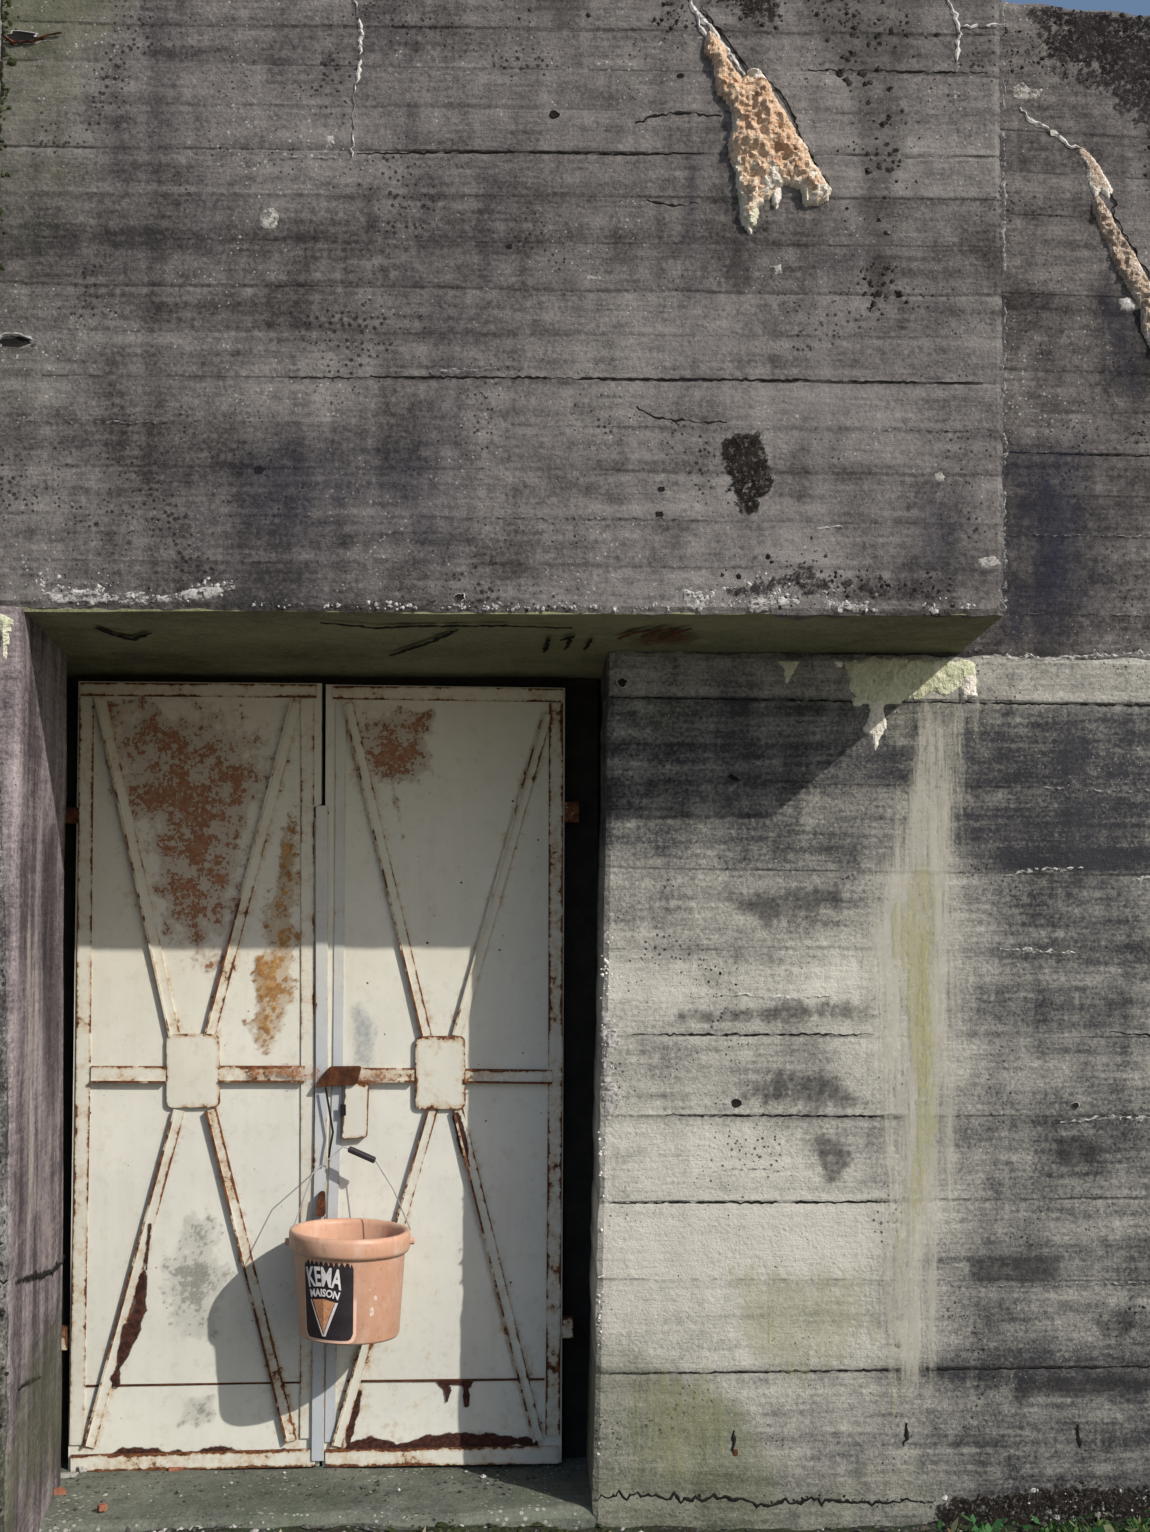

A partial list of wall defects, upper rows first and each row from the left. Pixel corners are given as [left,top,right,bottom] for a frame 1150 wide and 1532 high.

crack [350,0,722,157]
crack [689,0,746,76]
spalling [701,6,833,235]
crack [808,0,1004,74]
spalling [1078,147,1150,348]
corrosion [95,696,283,972]
corrosion [243,806,319,1084]
damp [834,656,978,1382]
corrosion [110,1223,157,1387]
corrosion [344,1390,539,1449]
corrosion [437,1381,474,1407]
crack [594,1489,936,1509]